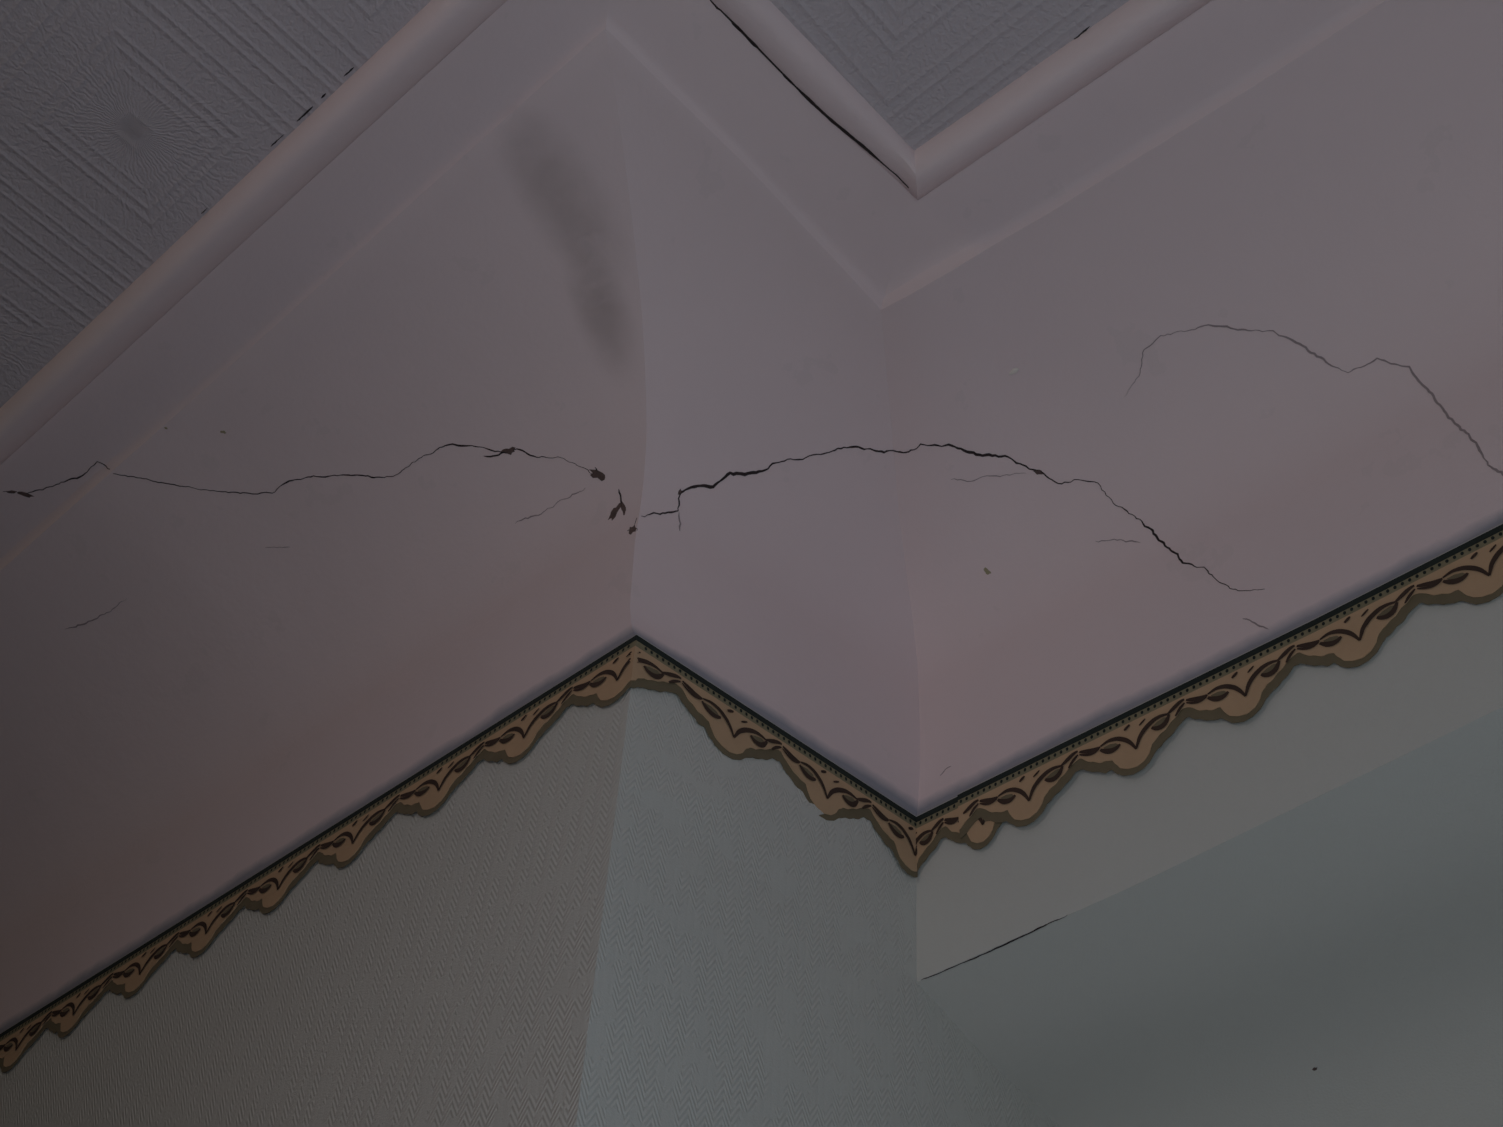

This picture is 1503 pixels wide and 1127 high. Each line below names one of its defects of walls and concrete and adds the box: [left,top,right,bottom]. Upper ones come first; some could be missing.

crack [710,0,909,188]
crack [3,443,605,523]
crack [627,443,1268,629]
crack [1124,324,1503,476]